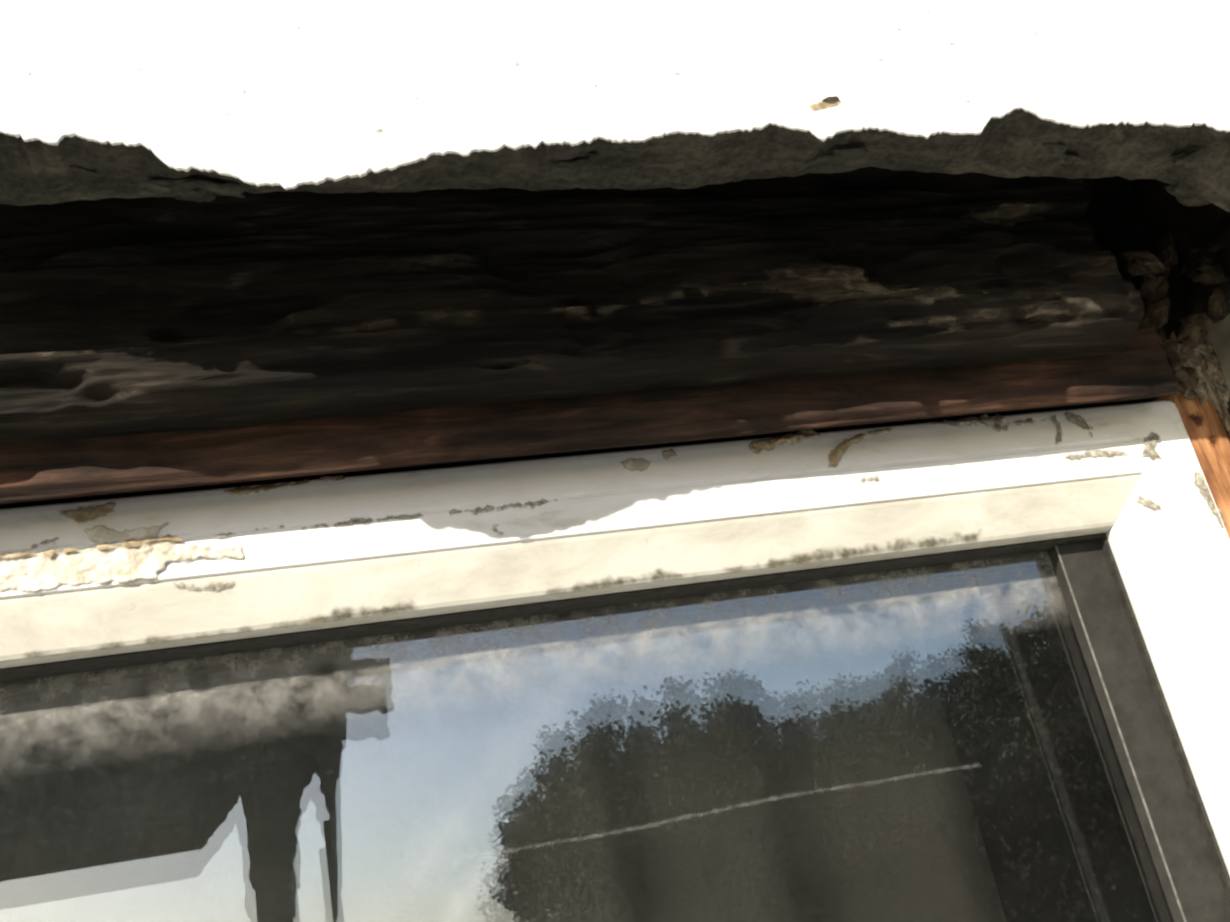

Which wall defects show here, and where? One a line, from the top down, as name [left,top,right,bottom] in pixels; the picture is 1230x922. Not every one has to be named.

spalling [809,96,841,110]
spalling [0,109,1230,392]
spalling [1018,397,1157,414]